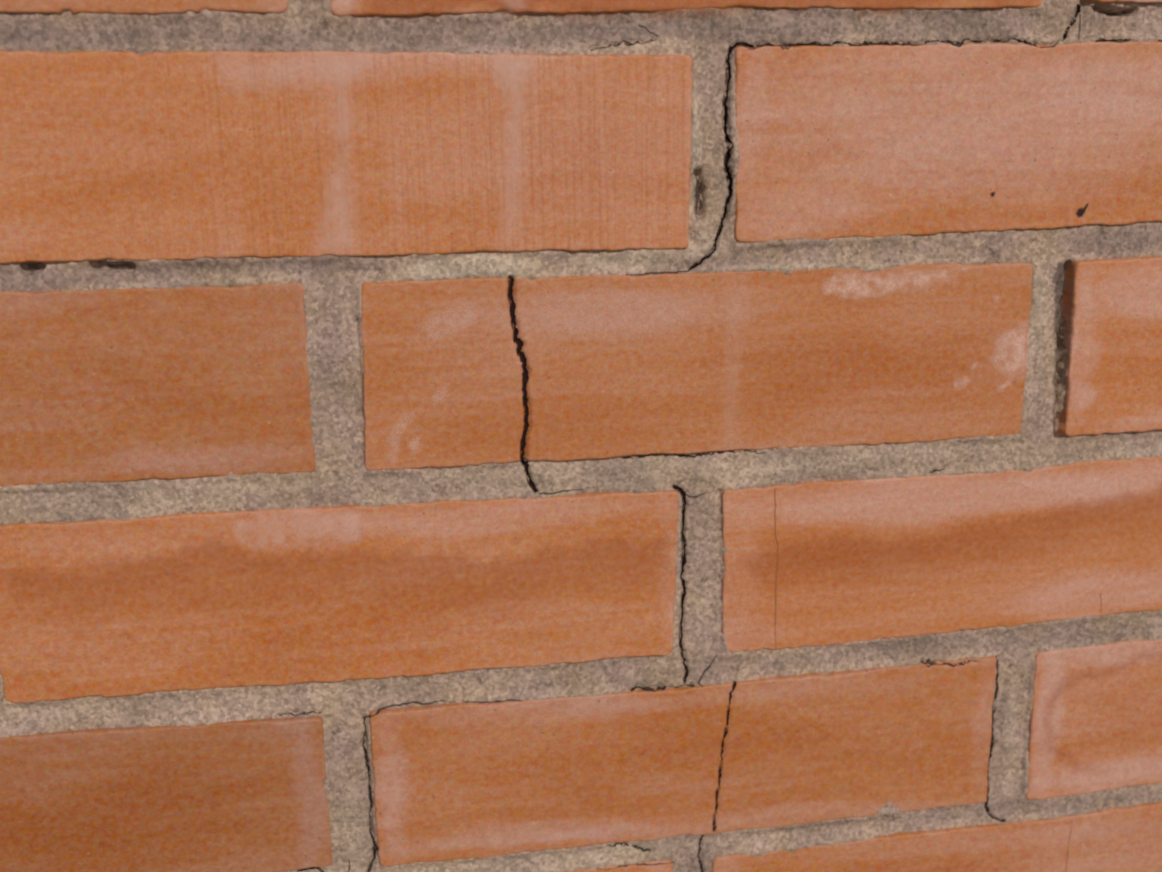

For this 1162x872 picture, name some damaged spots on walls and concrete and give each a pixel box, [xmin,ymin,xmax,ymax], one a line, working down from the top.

crack [626,0,1129,275]
crack [508,278,583,495]
crack [623,449,777,459]
crack [297,699,524,872]
crack [601,485,737,872]
crack [921,657,1006,822]